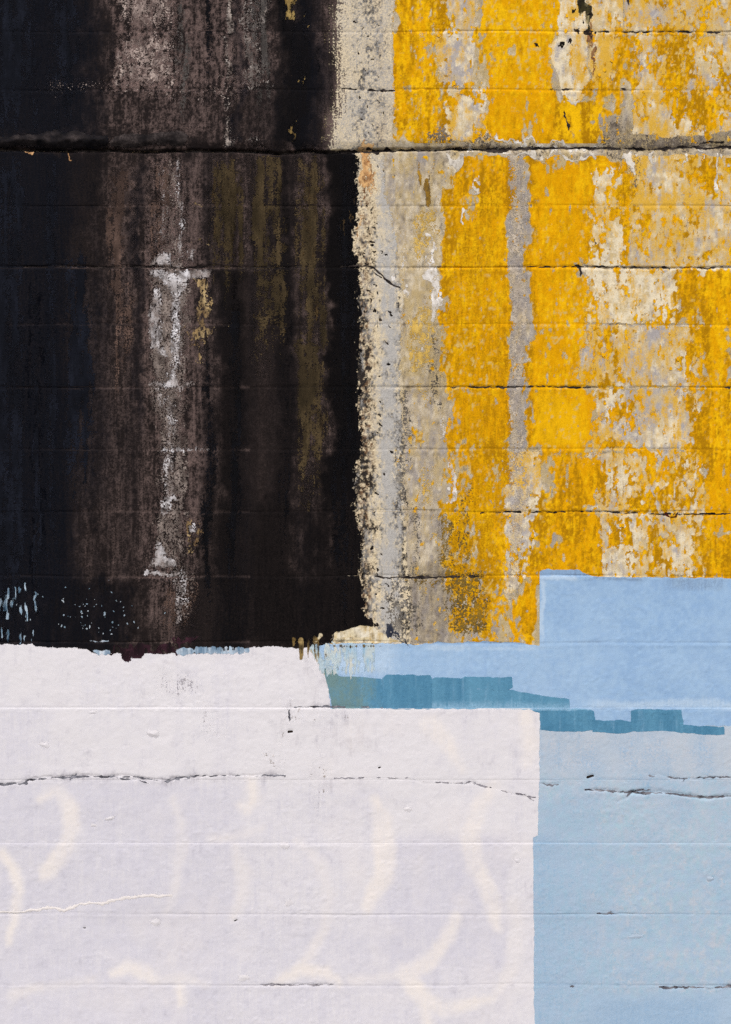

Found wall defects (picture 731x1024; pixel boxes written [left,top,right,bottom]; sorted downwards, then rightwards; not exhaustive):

crack [0,88,731,155]
peeling [435,0,491,143]
peeling [534,0,731,138]
damp [0,0,491,678]
spalling [315,0,443,644]
peeling [577,154,731,578]
peeling [446,461,457,504]
peeling [502,451,543,598]
crack [0,773,286,786]
crack [334,777,559,799]
crack [585,775,731,799]